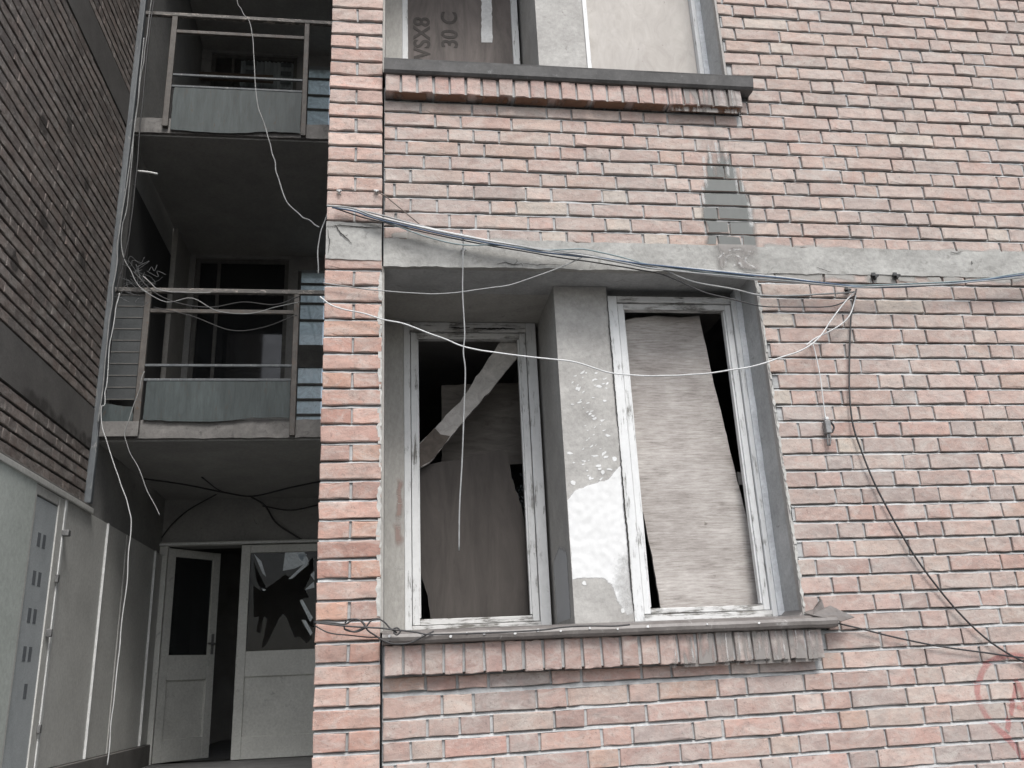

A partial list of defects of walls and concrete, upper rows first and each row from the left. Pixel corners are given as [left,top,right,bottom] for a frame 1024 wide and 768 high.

water stain [703,153,758,269]
peeling [567,370,632,614]